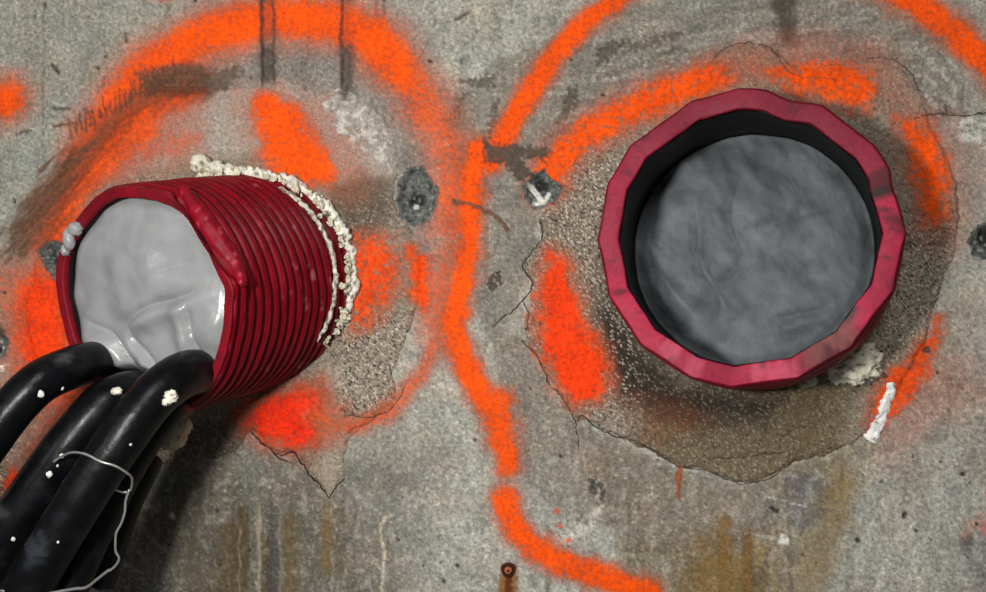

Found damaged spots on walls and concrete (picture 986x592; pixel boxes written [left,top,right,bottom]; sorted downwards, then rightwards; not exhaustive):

leakage [260,0,274,81]
leakage [339,11,352,96]
crack [712,41,838,82]
crack [866,57,986,119]
rust [501,570,516,592]